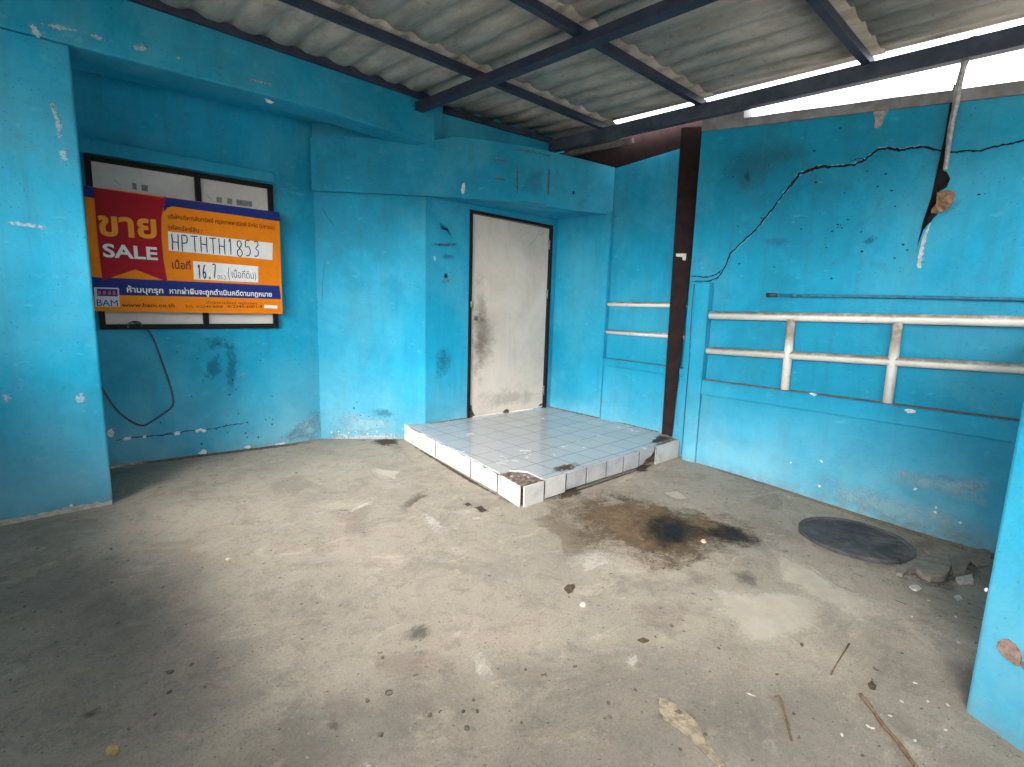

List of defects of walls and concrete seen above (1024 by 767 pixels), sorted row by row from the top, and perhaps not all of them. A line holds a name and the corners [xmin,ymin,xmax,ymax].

peeling [49,103,68,161]
spalling [917,60,970,268]
crack [692,139,1024,282]
crack [116,423,243,441]
spalling [896,544,991,583]
spalling [996,639,1024,670]